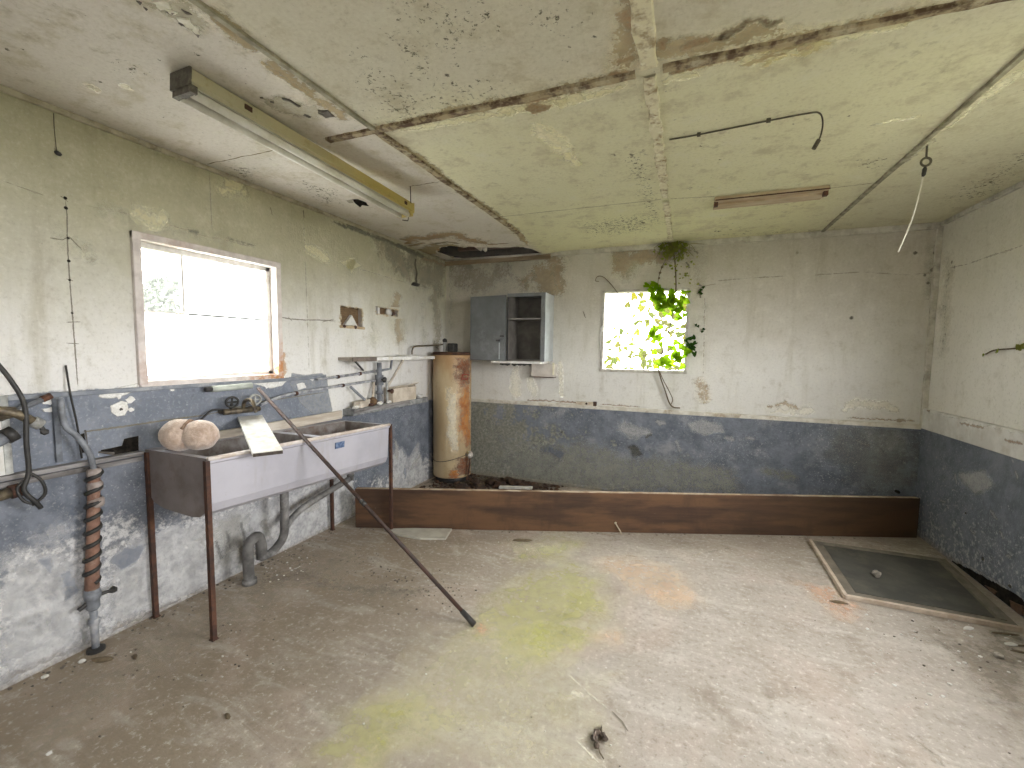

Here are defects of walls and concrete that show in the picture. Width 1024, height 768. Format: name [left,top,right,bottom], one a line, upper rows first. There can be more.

peeling [136,0,203,38]
water stain [656,18,825,66]
peeling [260,97,335,118]
water stain [335,222,509,349]